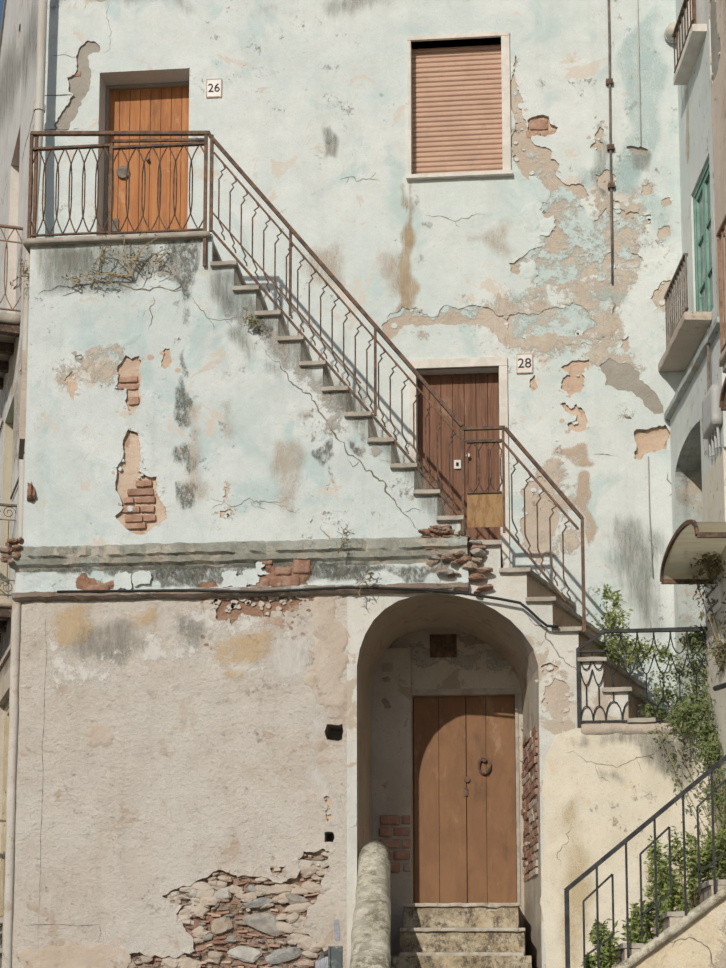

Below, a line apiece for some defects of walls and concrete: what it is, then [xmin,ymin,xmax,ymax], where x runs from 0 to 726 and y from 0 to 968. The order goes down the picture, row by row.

peeling [710,0,721,81]
spalling [54,41,100,131]
leakage [165,239,198,298]
peeling [380,57,672,434]
flaking render [55,344,181,415]
leakage [175,359,192,426]
flaking render [112,428,167,535]
leakage [176,483,197,507]
crack [263,348,423,535]
spalling [634,426,670,460]
peeling [46,562,314,691]
crack [666,937,716,968]